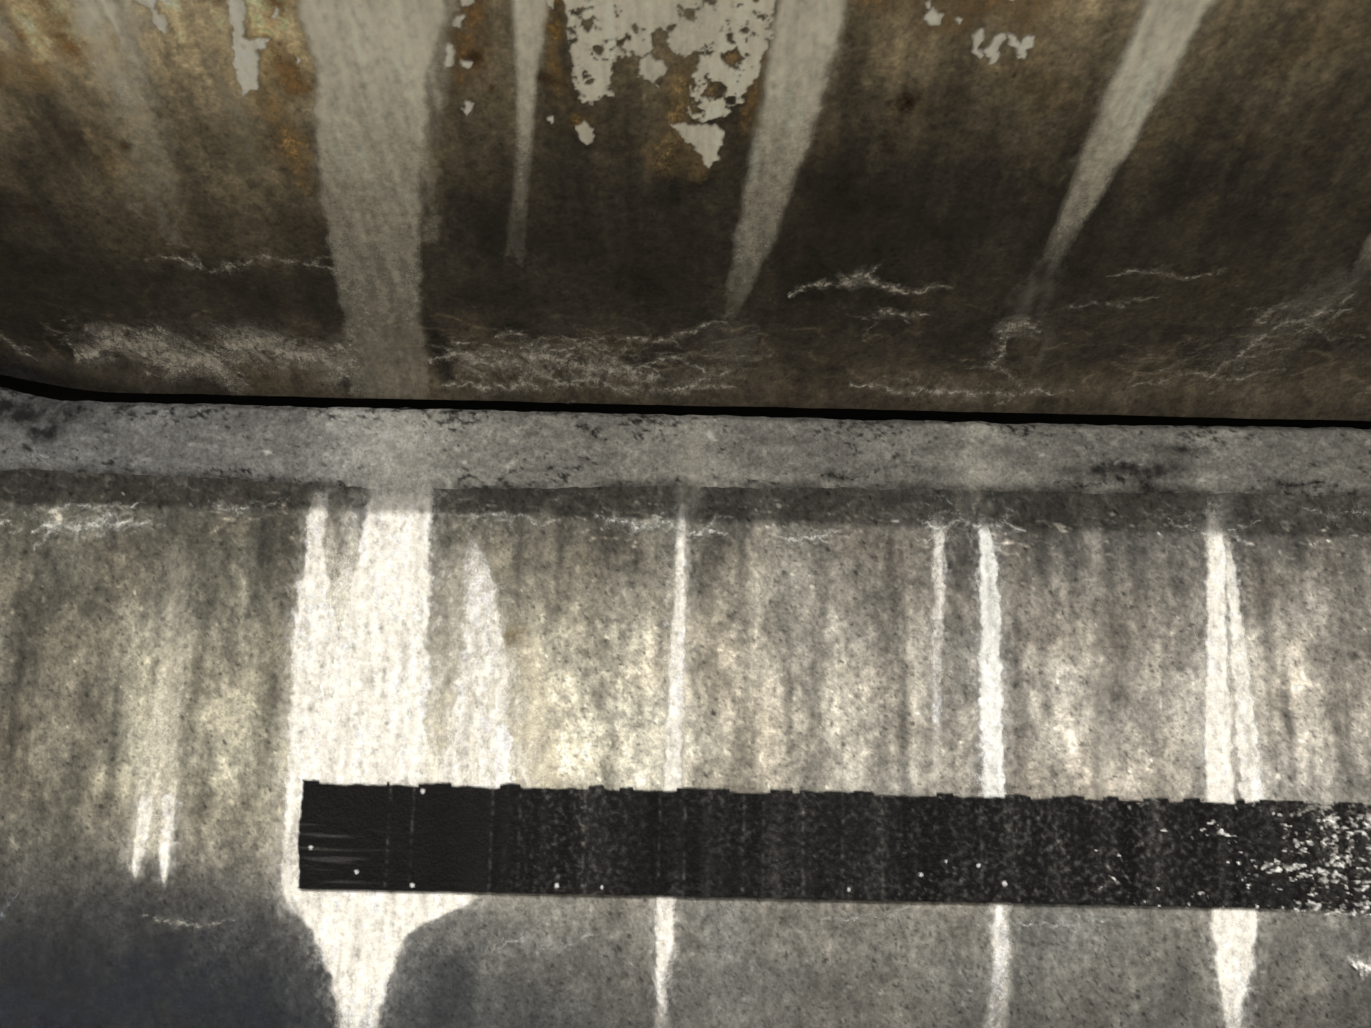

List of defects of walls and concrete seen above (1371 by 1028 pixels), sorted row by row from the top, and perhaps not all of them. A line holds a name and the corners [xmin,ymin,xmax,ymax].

peeling [444,44,473,69]
peeling [546,0,776,168]
peeling [924,0,963,26]
peeling [972,28,1035,65]
crack [789,267,928,316]
crack [1199,296,1351,380]
crack [1053,473,1261,536]
crack [1257,480,1370,536]
damp [977,520,1006,798]
damp [1191,513,1265,821]
damp [281,482,548,1028]
damp [1210,904,1258,1028]